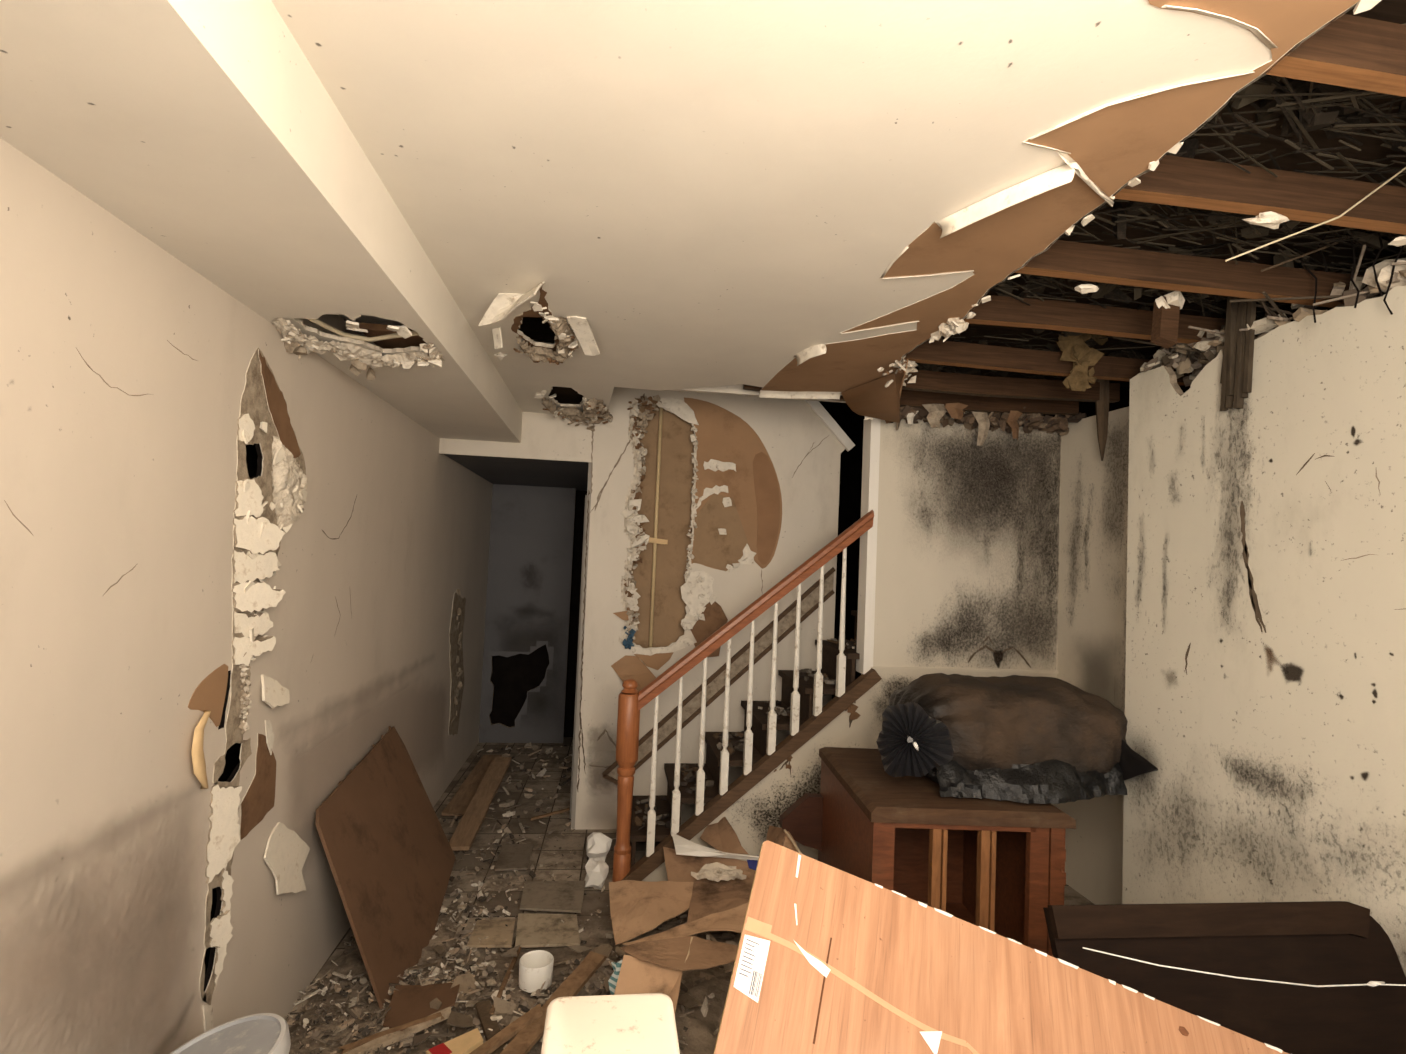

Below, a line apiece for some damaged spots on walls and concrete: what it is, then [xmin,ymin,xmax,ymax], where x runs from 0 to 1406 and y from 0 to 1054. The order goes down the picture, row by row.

peeling [759,0,1381,399]
spalling [272,317,444,381]
hole [478,282,600,365]
spalling [199,347,310,1032]
spalling [448,588,466,736]
spalling [534,386,728,691]
water stain [923,434,1087,668]
water stain [1202,409,1267,633]